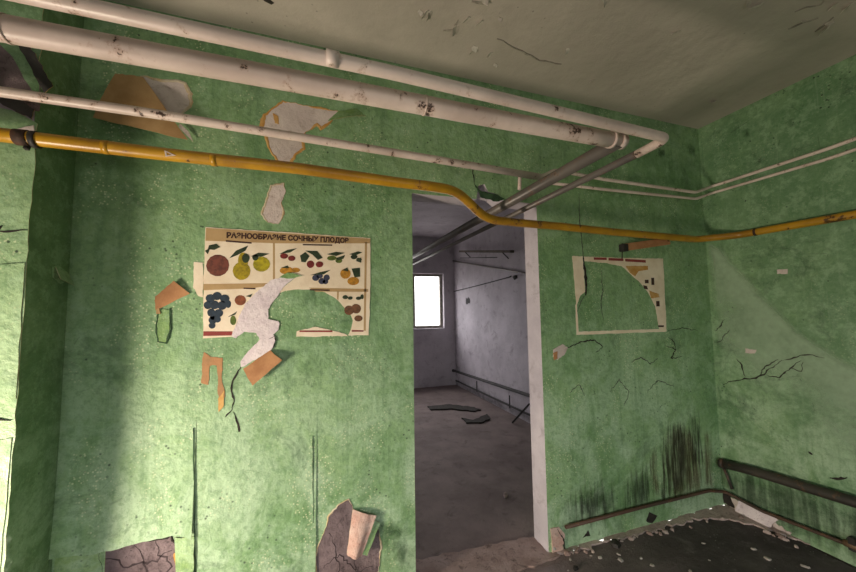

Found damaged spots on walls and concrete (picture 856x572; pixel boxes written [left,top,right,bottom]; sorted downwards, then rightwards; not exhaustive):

crack [225,367,241,432]
flaking render [99,536,194,572]
flaking render [315,499,383,572]